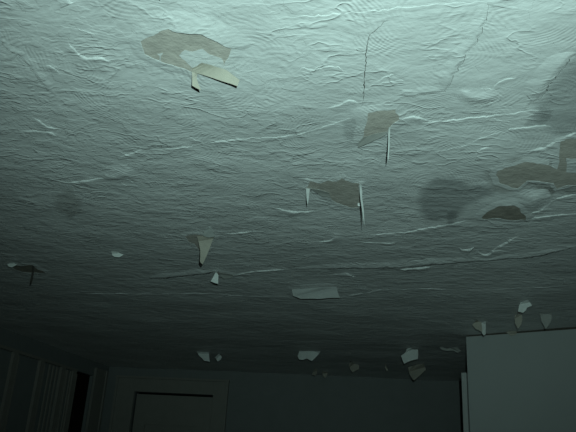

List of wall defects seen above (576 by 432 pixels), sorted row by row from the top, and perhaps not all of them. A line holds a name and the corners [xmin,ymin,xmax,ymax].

peeling [127,10,255,90]
crack [121,1,487,161]
peeling [349,103,412,160]
peeling [473,133,576,223]
peeling [297,174,369,220]
peeling [178,227,221,264]
peeling [287,283,344,299]
peeling [514,300,532,328]
peeling [196,351,222,362]
peeling [298,351,320,361]
peeling [401,347,426,380]